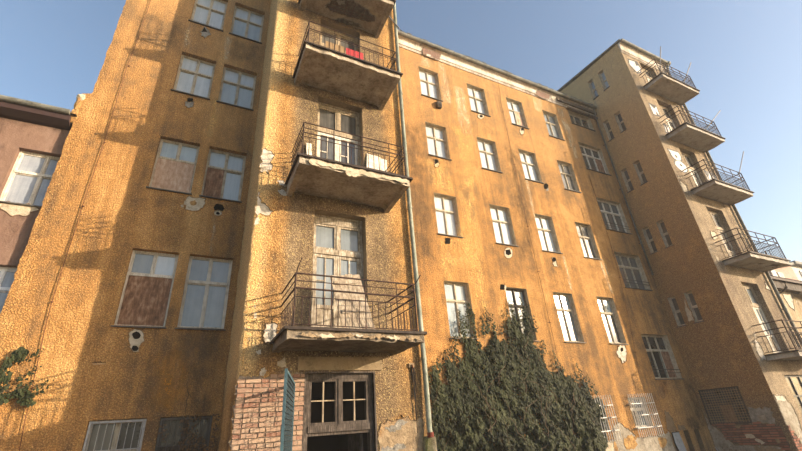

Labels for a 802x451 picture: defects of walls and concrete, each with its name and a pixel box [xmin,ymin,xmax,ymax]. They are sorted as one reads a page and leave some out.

peeling [259,148,276,174]
flaking render [0,201,39,217]
flaking render [181,195,225,216]
peeling [254,191,273,225]
peeling [256,322,279,355]
spalling [300,331,420,341]
flaking render [228,357,305,451]
flaking render [377,415,426,451]
flaking render [606,410,687,451]
flaking render [773,394,802,451]